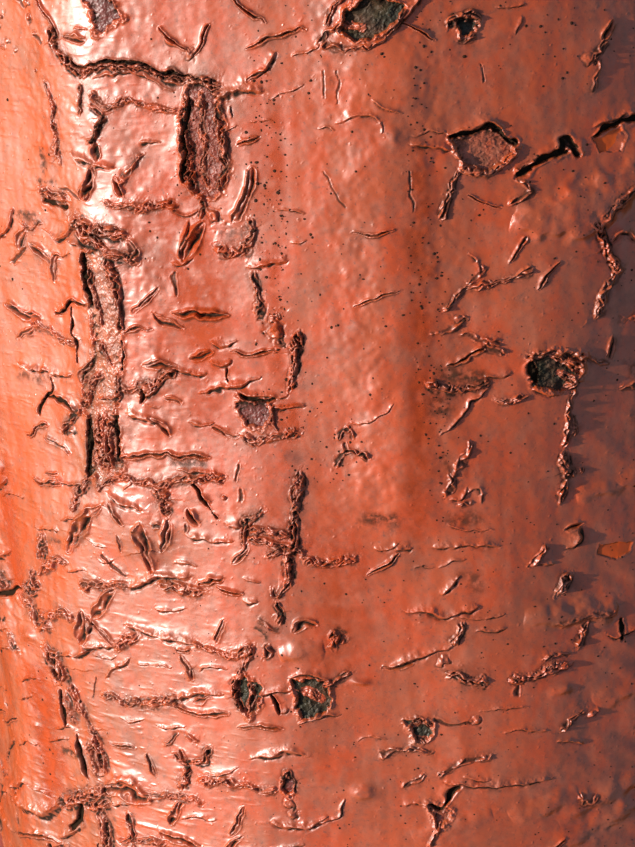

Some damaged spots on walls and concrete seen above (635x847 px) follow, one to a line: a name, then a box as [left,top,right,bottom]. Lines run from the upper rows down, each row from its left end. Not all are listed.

peeling [81,0,133,42]
peeling [291,0,438,62]
crack [0,0,227,274]
peeling [172,84,237,202]
peeling [443,115,524,185]
peeling [28,248,142,483]
peeling [231,326,310,433]
peeling [521,342,591,399]
crack [329,421,375,469]
crack [147,462,315,680]
peeling [192,632,268,724]
crack [259,684,292,716]